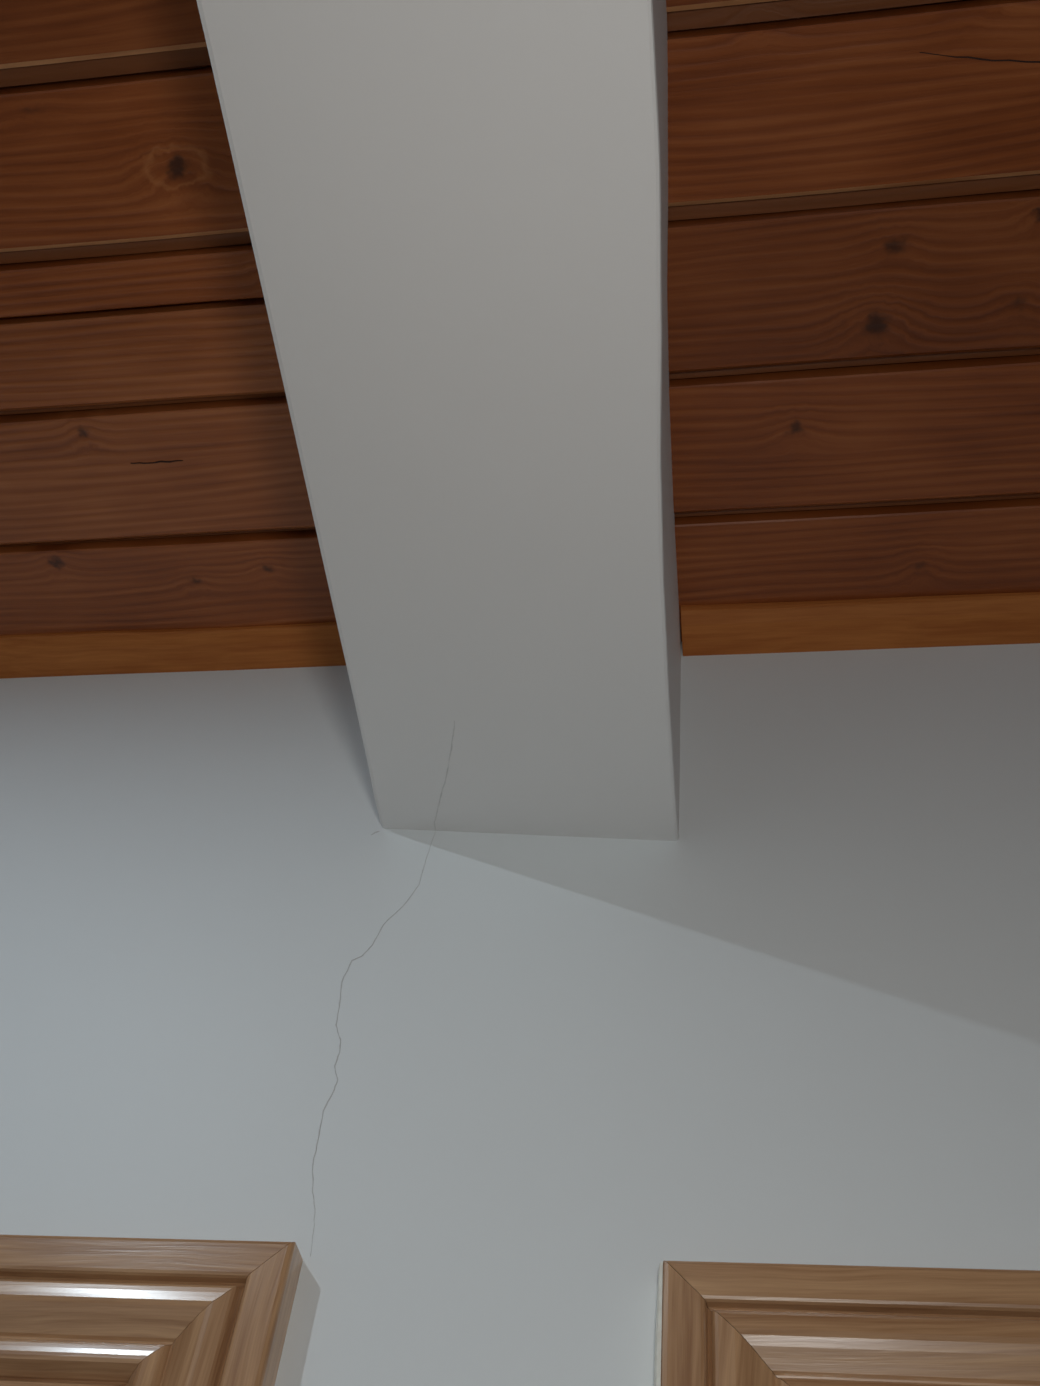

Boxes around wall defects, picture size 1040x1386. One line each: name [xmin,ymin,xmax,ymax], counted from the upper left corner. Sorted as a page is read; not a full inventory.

crack [310,721,455,1256]